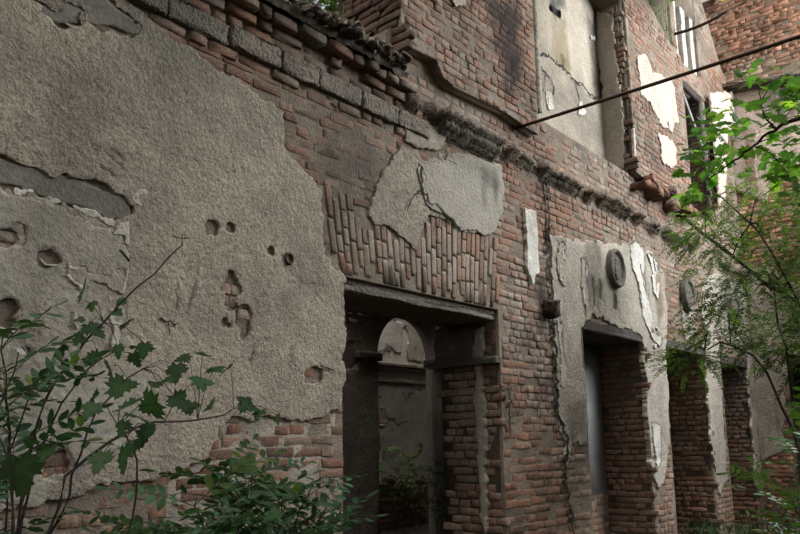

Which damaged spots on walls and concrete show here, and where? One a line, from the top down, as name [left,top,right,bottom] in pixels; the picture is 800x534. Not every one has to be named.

flaking render [33,0,141,34]
flaking render [0,159,147,245]
crack [407,165,461,229]
flaking render [0,229,17,248]
flaking render [580,255,593,319]
flaking render [630,238,663,349]
crack [539,179,575,534]
flaking render [556,318,568,387]
crack [500,385,518,440]
flaking render [164,413,342,534]
flaking render [652,421,662,469]